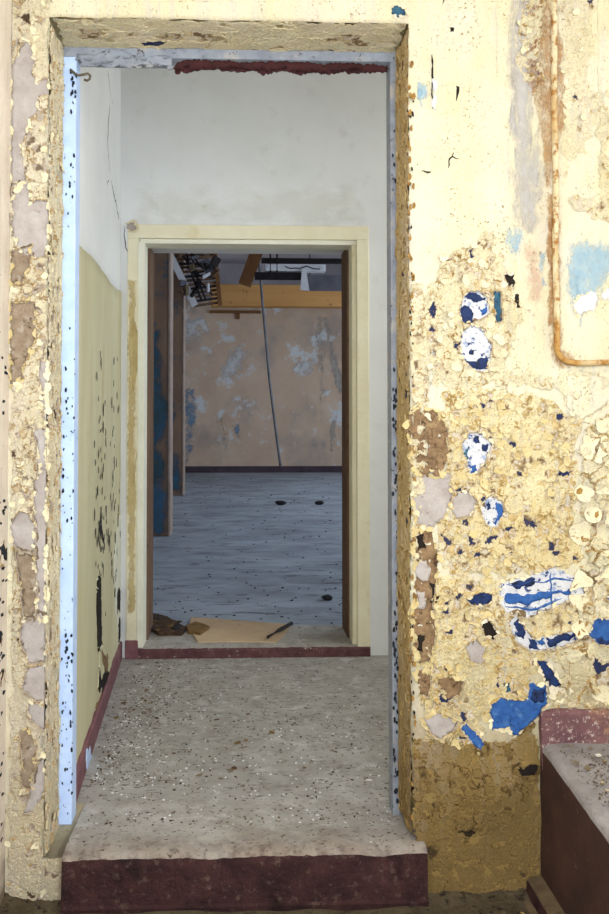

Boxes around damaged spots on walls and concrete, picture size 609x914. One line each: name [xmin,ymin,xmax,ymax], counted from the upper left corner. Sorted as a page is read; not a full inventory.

peeling [515,0,546,100]
peeling [557,0,609,223]
spalling [8,300,38,388]
peeling [572,287,609,318]
peeling [8,407,45,550]
spalling [15,549,38,616]
flaking render [94,396,121,710]
spalling [19,727,37,790]
peeling [39,858,62,901]